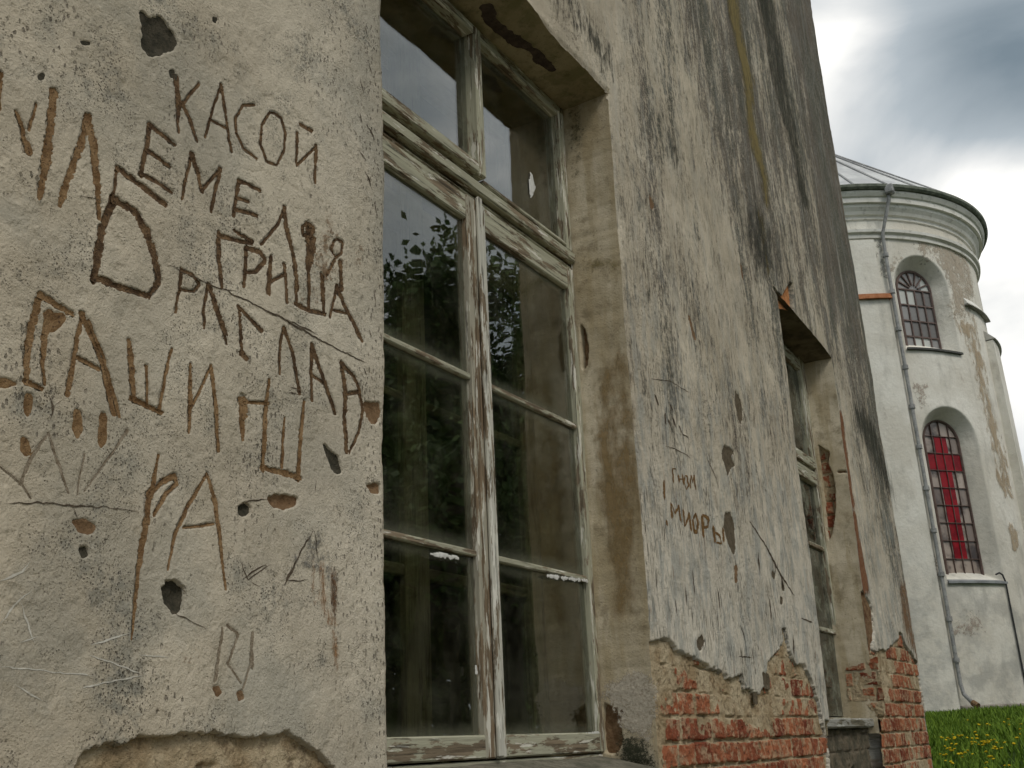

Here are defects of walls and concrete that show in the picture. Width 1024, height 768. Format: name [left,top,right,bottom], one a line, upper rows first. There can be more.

spalling [139,11,177,57]
leakage [727,0,779,297]
leakage [758,0,810,211]
crack [165,263,367,375]
crack [7,501,140,518]
spalling [161,581,182,615]
spalling [267,494,296,510]
leakage [598,359,636,612]
crack [668,433,812,657]
flaking render [820,447,836,538]
leakage [852,395,895,502]
flaking render [647,591,933,768]